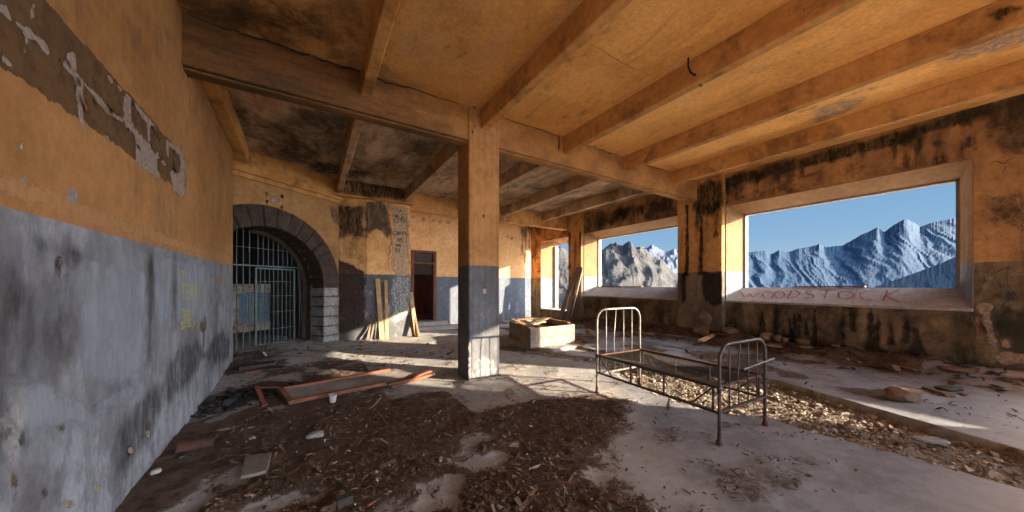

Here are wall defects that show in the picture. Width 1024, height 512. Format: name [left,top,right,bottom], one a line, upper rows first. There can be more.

peeling [0,4,50,55]
crack [182,12,457,104]
peeling [63,51,185,198]
water stain [257,117,425,238]
crack [503,117,560,152]
water stain [725,94,1024,203]
peeling [386,206,411,322]
water stain [568,199,672,269]
water stain [680,205,947,360]
spalling [976,302,1024,365]
water stain [121,334,229,469]